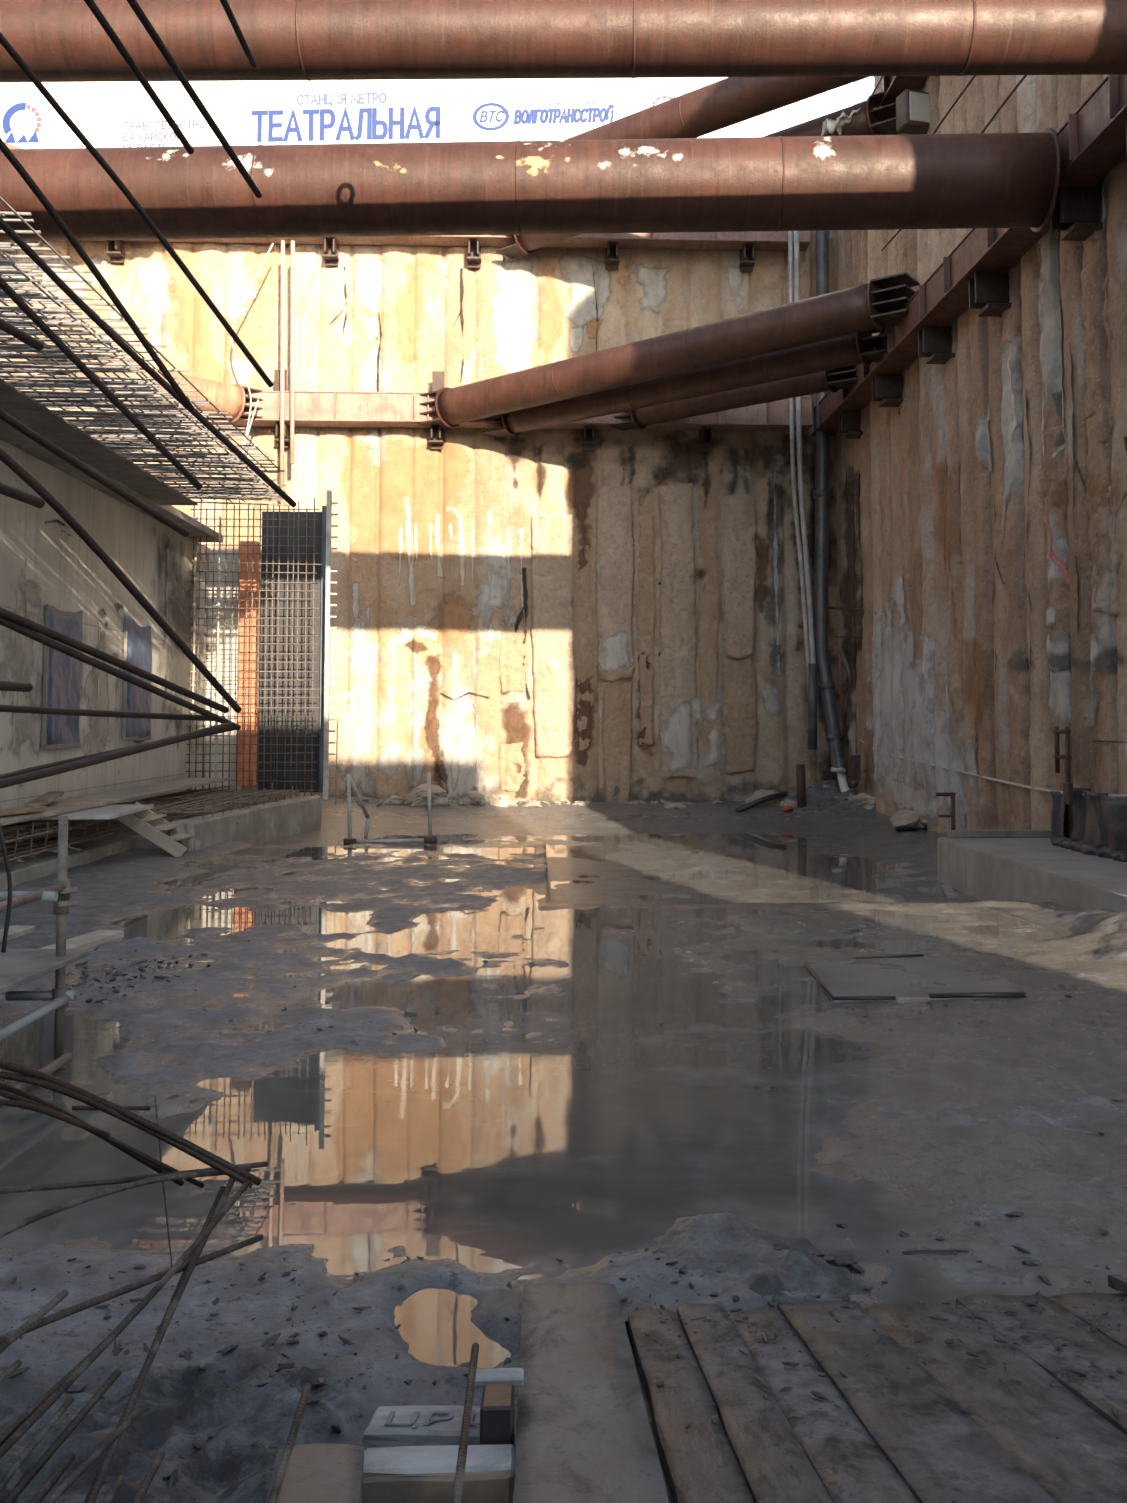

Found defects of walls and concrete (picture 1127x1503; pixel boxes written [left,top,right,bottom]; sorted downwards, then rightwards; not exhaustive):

peeling [496,141,570,176]
peeling [814,137,835,159]